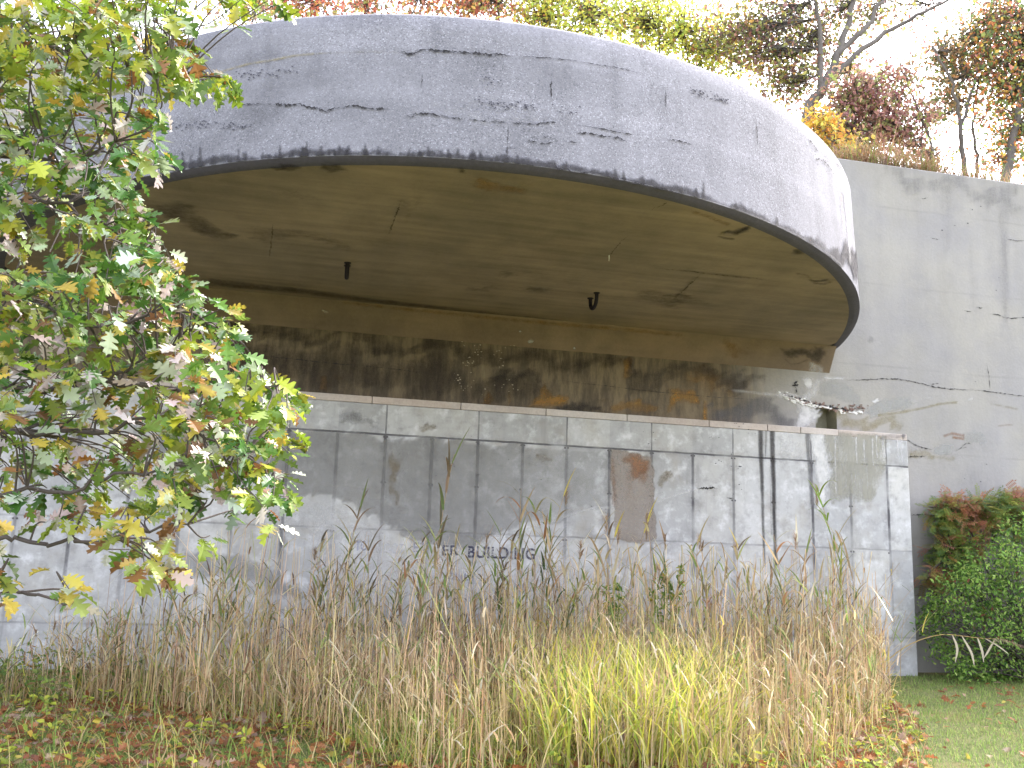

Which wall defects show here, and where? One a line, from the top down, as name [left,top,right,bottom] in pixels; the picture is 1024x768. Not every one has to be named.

crack [244,102,383,112]
crack [402,48,682,210]
water stain [262,146,858,279]
water stain [780,379,819,501]
spalling [777,391,869,415]
crack [862,371,1021,396]
rust [610,449,657,543]